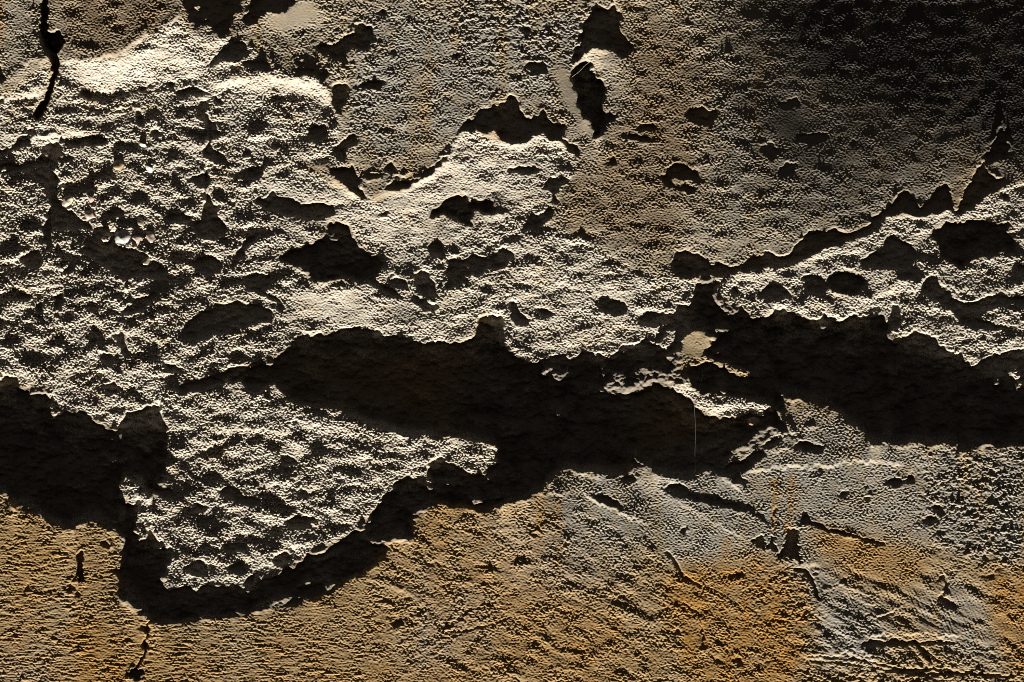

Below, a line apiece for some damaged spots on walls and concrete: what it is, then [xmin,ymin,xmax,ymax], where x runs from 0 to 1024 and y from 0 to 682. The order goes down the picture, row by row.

crack [33,0,66,123]
spalling [0,17,920,595]
spalling [716,183,1024,387]